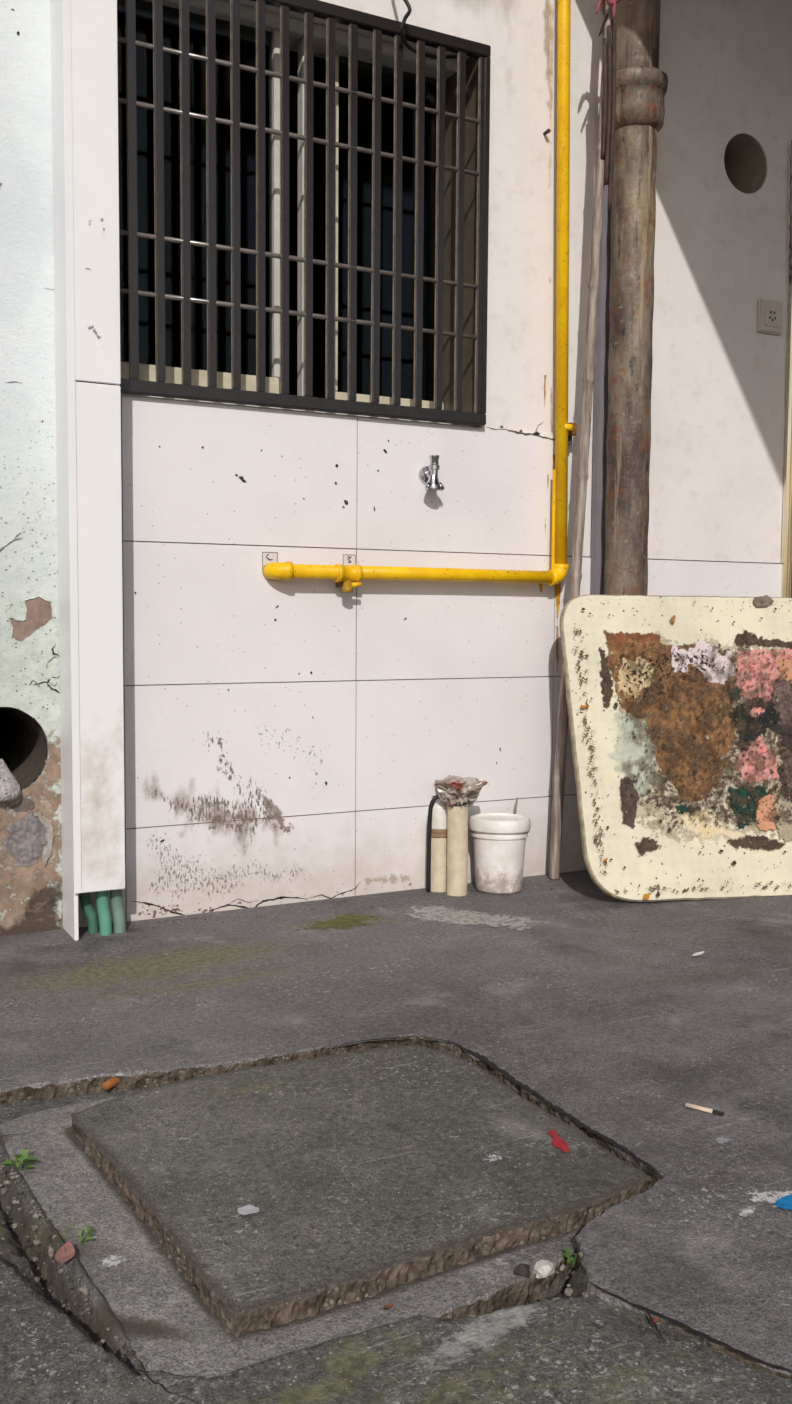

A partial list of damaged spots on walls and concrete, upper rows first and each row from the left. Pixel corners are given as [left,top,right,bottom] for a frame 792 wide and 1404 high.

crack [487,422,555,440]
spalling [7,595,53,641]
flaking render [0,733,62,930]
damp [154,733,294,842]
crack [131,881,361,915]
crack [588,1281,792,1372]